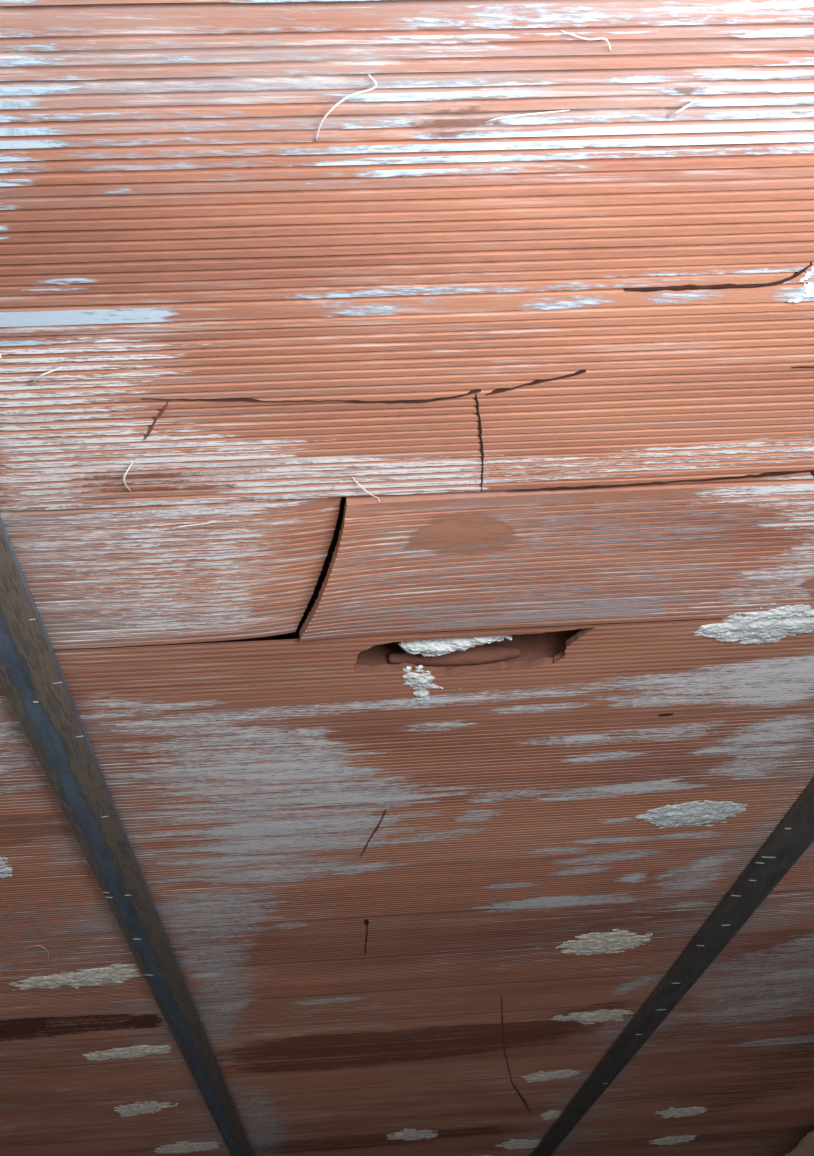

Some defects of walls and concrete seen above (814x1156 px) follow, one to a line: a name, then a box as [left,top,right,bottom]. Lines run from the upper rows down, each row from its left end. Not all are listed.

water stain [247,0,380,8]
water stain [383,4,610,52]
water stain [610,0,814,38]
water stain [0,28,814,187]
water stain [22,278,98,291]
crack [626,262,813,292]
crack [141,369,586,492]
water stain [0,307,814,639]
crack [510,470,814,491]
spalling [54,619,814,747]
water stain [77,654,814,1073]
crack [501,995,531,1113]